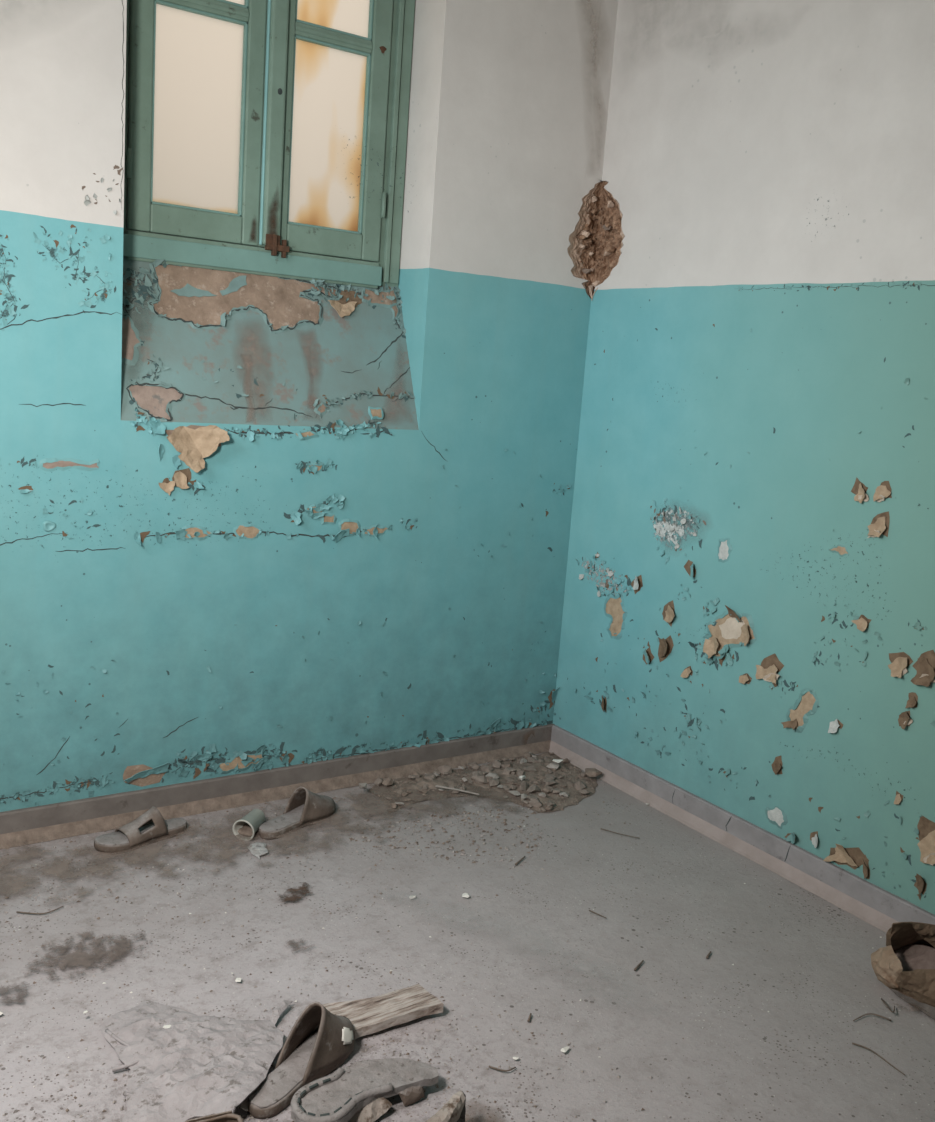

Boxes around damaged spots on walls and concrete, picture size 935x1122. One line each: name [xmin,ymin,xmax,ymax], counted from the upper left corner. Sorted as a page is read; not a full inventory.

crack [0,311,120,330]
peeling [0,224,415,548]
crack [185,394,312,417]
crack [342,332,414,402]
crack [0,518,392,552]
peeling [851,478,896,538]
peeling [0,487,820,806]
peeling [792,529,935,729]
peeling [828,719,843,733]
peeling [771,742,850,775]
peeling [749,780,796,844]
peeling [810,782,935,901]